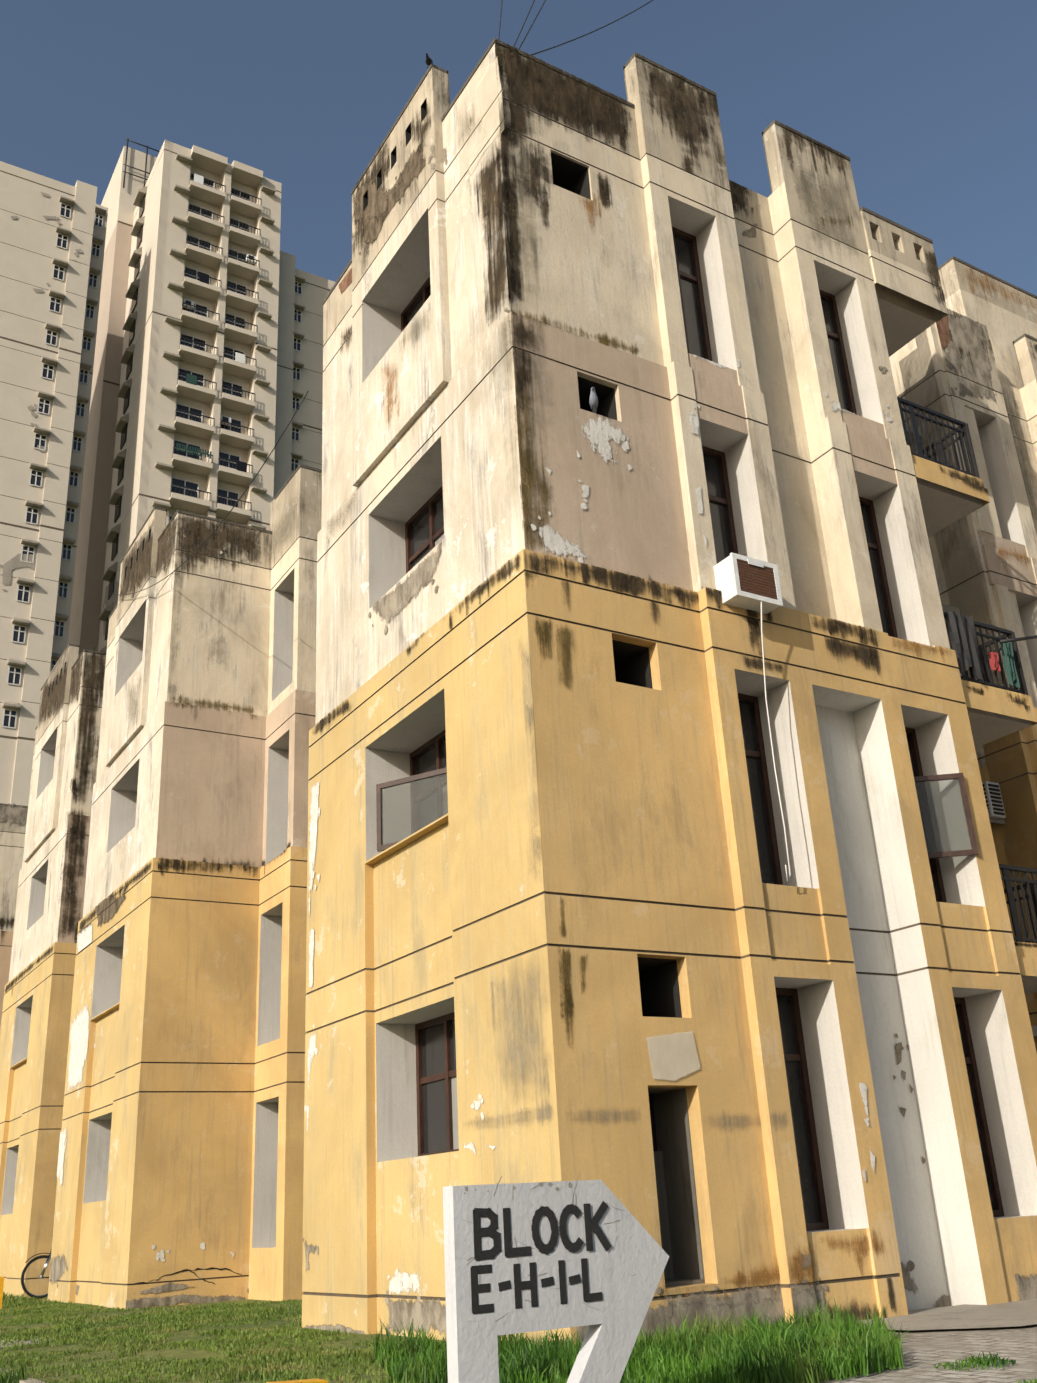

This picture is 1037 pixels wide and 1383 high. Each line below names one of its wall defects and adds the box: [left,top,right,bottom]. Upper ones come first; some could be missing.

leakage [411,106,431,152]
leakage [642,59,719,173]
leakage [352,143,390,251]
leakage [476,40,630,494]
leakage [925,251,988,366]
peeling [576,416,632,470]
peeling [578,479,590,510]
peeling [531,511,589,563]
leakage [449,554,722,629]
leakage [536,621,571,687]
leakage [814,618,879,673]
leakage [5,652,290,997]